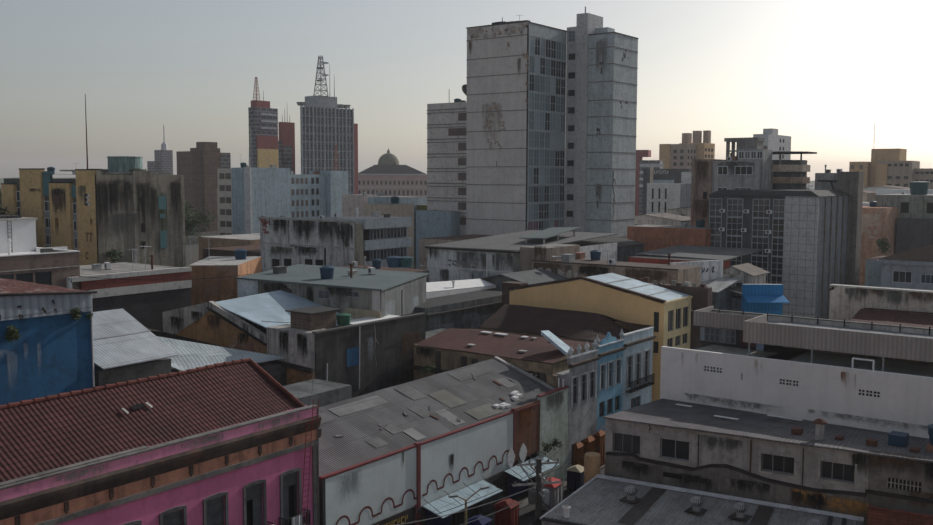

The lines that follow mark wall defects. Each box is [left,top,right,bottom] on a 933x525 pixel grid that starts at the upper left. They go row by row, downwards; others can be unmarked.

leakage [78,180,181,232]
leakage [269,219,353,255]